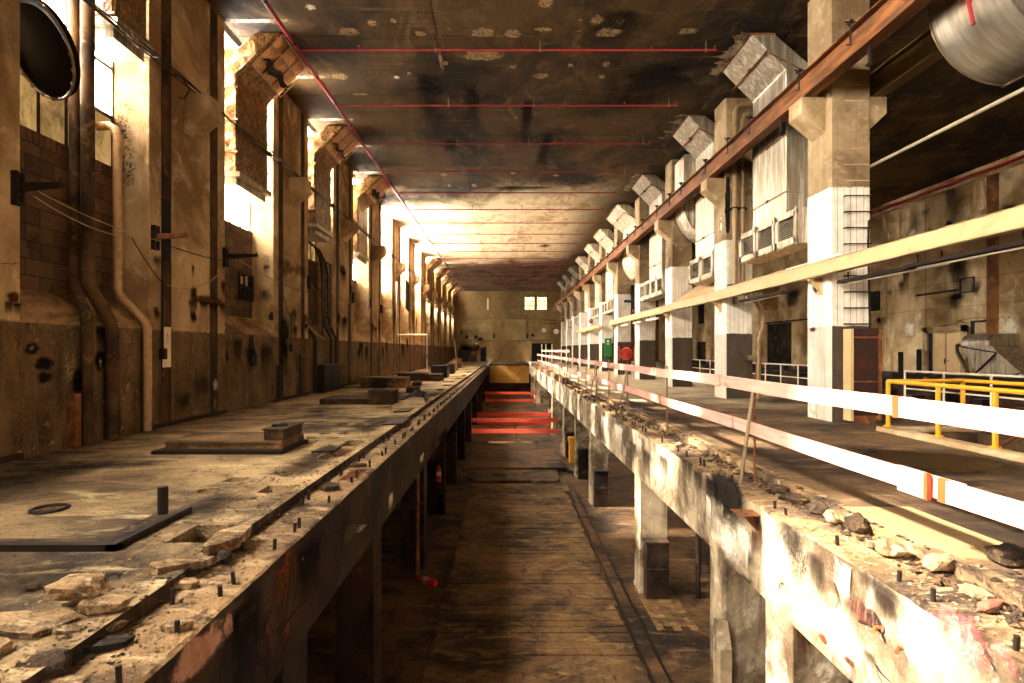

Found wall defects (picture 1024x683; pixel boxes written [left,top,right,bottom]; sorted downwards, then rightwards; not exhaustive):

water stain [387,70,453,124]
mould [116,104,135,185]
water stain [764,524,823,594]
water stain [817,599,873,666]
spalling [850,599,882,631]
water stain [842,566,896,612]